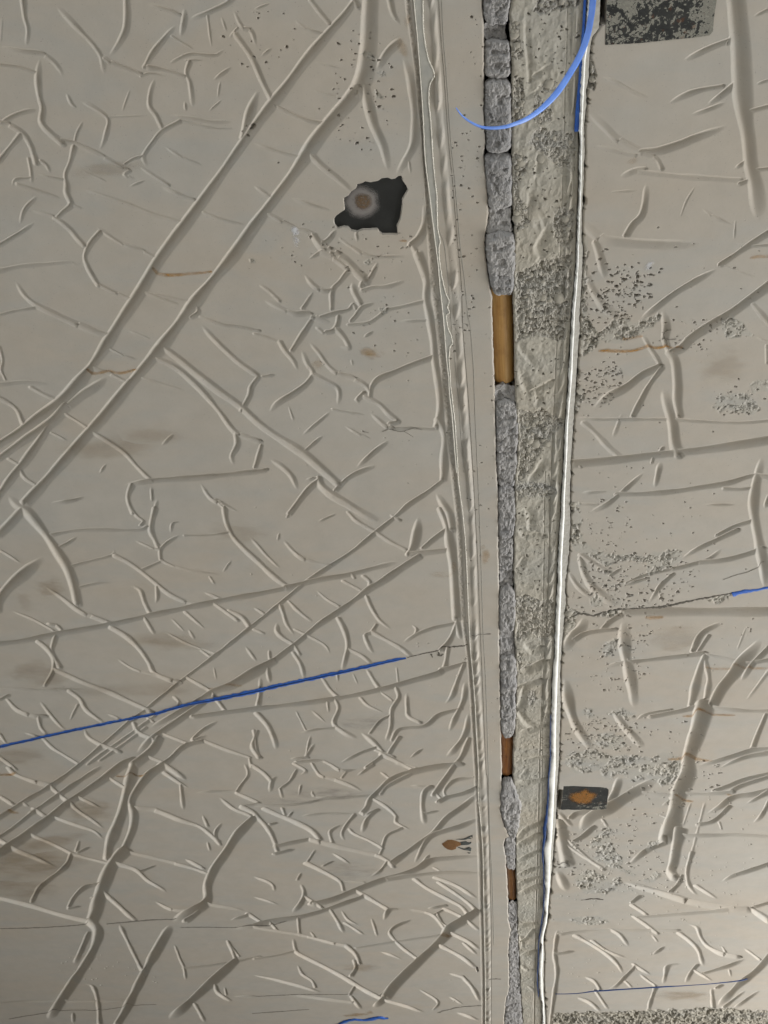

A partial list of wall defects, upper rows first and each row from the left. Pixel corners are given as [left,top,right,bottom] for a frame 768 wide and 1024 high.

crack [573,562,762,617]
crack [407,633,490,658]
corrosion [570,790,595,804]
corrosion [442,835,473,854]
crack [0,918,287,929]
crack [252,993,350,1014]